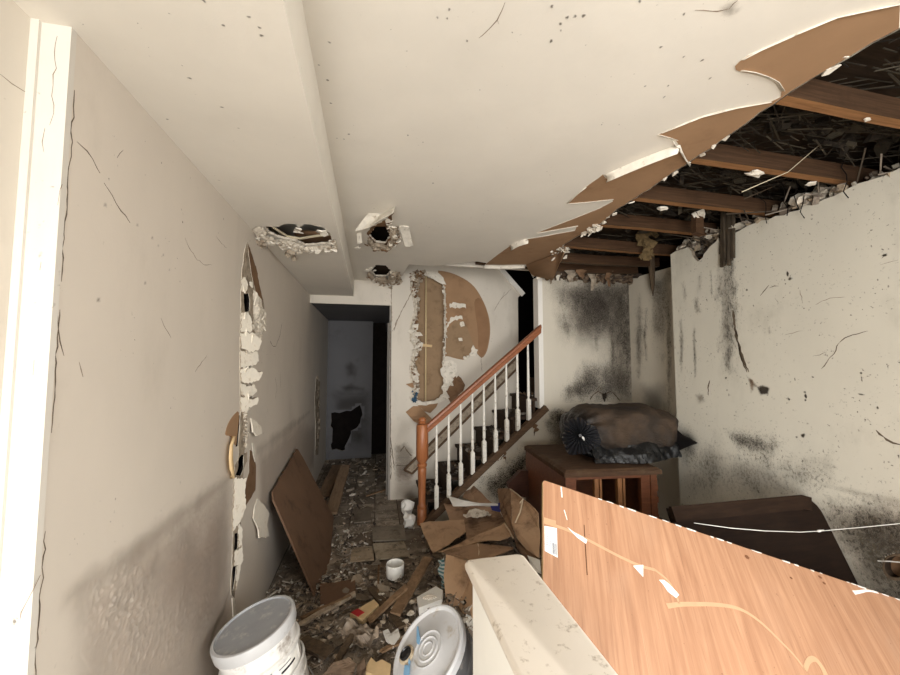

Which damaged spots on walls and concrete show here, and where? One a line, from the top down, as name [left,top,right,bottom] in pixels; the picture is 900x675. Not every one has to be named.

crack [40,38,130,282]
hole [354,207,413,252]
peeling [484,4,900,269]
crack [33,312,60,433]
spalling [230,226,338,617]
spalling [365,265,465,423]
damp [568,284,646,401]
damp [718,263,749,372]
crack [20,531,46,675]
mould [829,510,900,598]